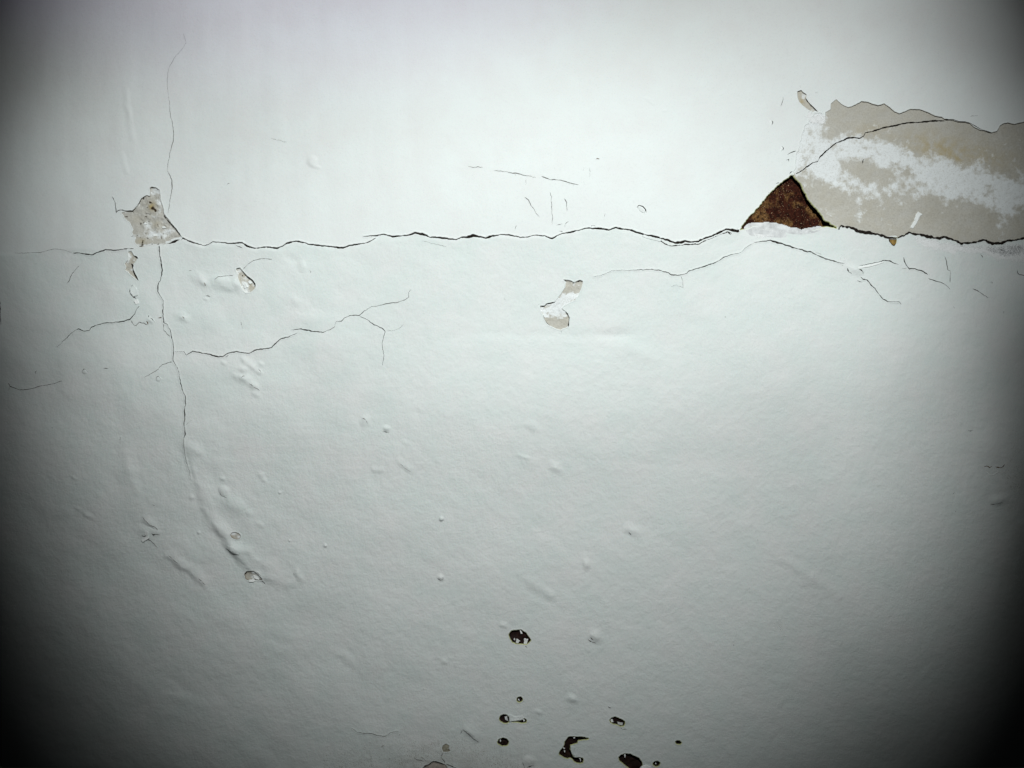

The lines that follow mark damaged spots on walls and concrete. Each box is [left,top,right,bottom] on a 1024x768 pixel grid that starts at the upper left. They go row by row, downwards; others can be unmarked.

crack [796,119,992,174]
peeling [739,89,1024,247]
peeling [109,185,183,325]
spalling [218,258,265,294]
spalling [539,278,584,331]
crack [32,225,1024,480]
peeling [243,569,265,584]
spalling [507,628,533,646]
spalling [608,707,627,729]
spalling [557,735,590,765]
spalling [617,752,662,768]